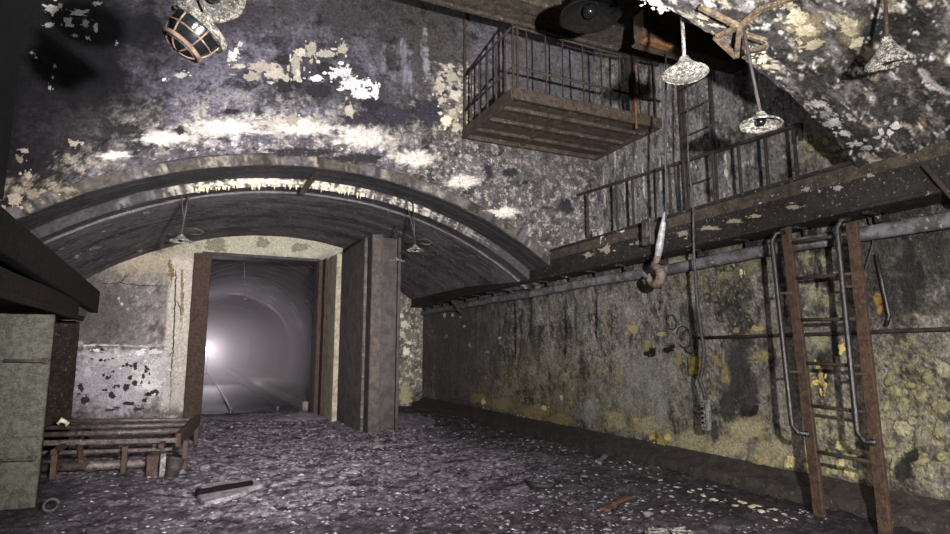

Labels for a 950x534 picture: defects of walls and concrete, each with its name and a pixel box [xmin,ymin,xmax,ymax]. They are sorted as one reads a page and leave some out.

peeling [42,0,103,42]
peeling [227,38,387,119]
water stain [918,68,947,94]
flaking render [1,148,69,209]
water stain [778,256,787,319]
water stain [891,236,925,311]
water stain [564,289,608,355]
peeling [73,341,175,419]
water stain [469,392,575,426]
water stain [894,448,919,481]